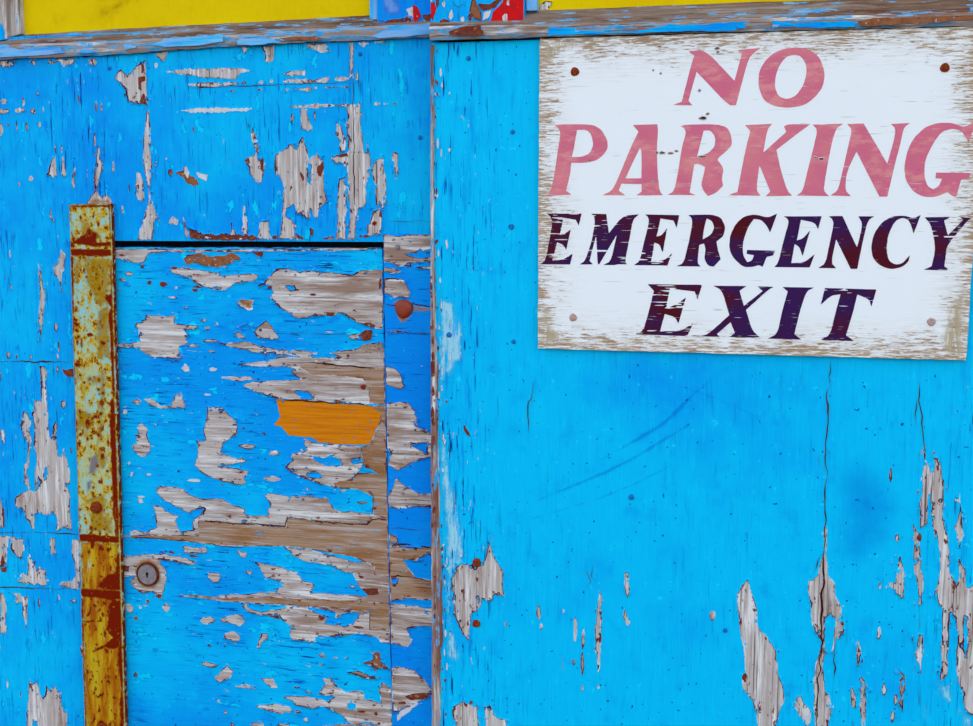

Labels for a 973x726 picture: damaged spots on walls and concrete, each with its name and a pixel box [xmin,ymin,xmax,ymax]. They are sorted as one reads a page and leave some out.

peeling [0,90,45,148]
peeling [18,144,77,190]
peeling [0,48,99,70]
peeling [86,131,124,214]
peeling [113,36,473,621]
peeling [0,248,81,650]
peeling [20,678,71,726]
rust [69,204,124,726]
peeling [200,531,510,726]
crack [815,363,836,726]
peeling [736,524,926,726]
peeling [877,444,973,717]